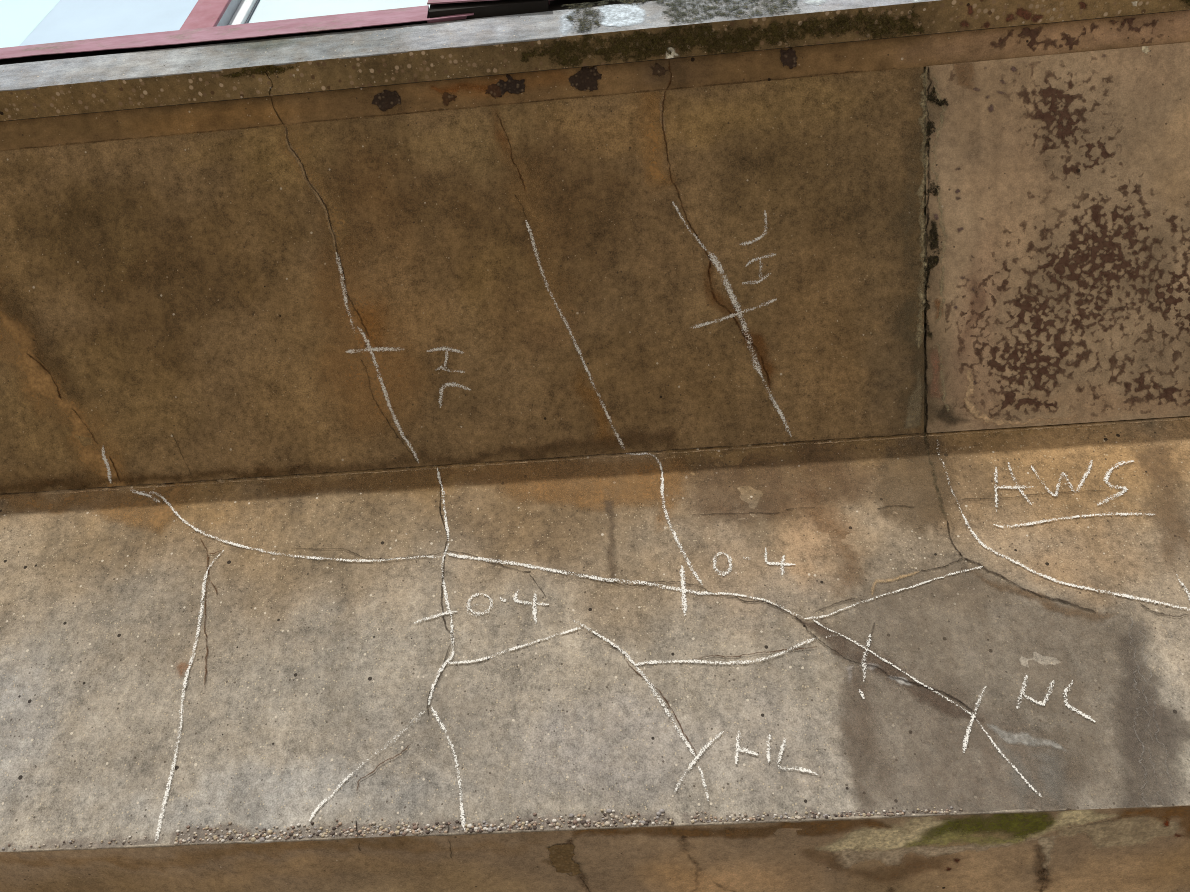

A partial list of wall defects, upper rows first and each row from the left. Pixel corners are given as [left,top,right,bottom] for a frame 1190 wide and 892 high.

water stain [561,11,573,35]
water stain [599,4,645,27]
crack [661,63,770,388]
peeling [946,185,1190,425]
peeling [1018,70,1122,179]
peeling [991,18,1158,51]
crack [200,538,221,685]
crack [348,485,545,716]
crack [606,644,696,753]
crack [563,434,1096,710]
water stain [575,638,1190,880]
water stain [915,580,1099,809]